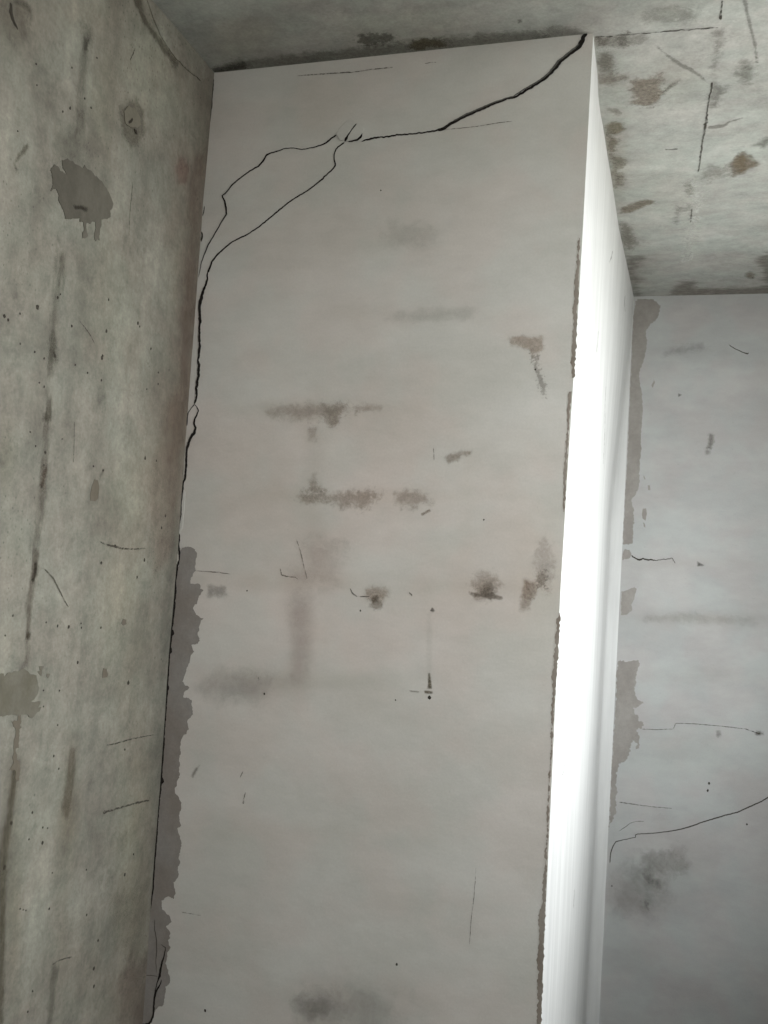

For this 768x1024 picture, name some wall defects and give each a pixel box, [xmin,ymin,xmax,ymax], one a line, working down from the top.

crack [145,1,723,1024]
peeling [621,587,637,615]
peeling [622,299,661,560]
peeling [143,547,203,1024]
peeling [608,660,644,830]
crack [610,797,768,859]